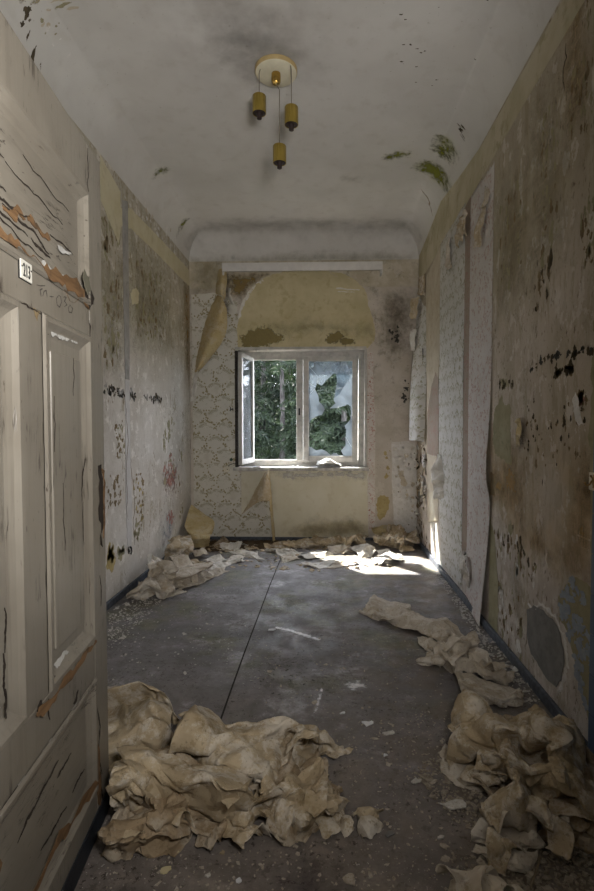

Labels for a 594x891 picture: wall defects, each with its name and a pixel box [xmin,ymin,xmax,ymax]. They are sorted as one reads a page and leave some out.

peeling [20,0,79,72]
peeling [580,195,594,269]
peeling [534,249,553,312]
peeling [190,268,376,402]
spalling [553,359,574,379]
peeling [524,389,588,468]
peeling [241,448,390,538]
crack [0,608,8,719]
peeling [36,640,97,717]